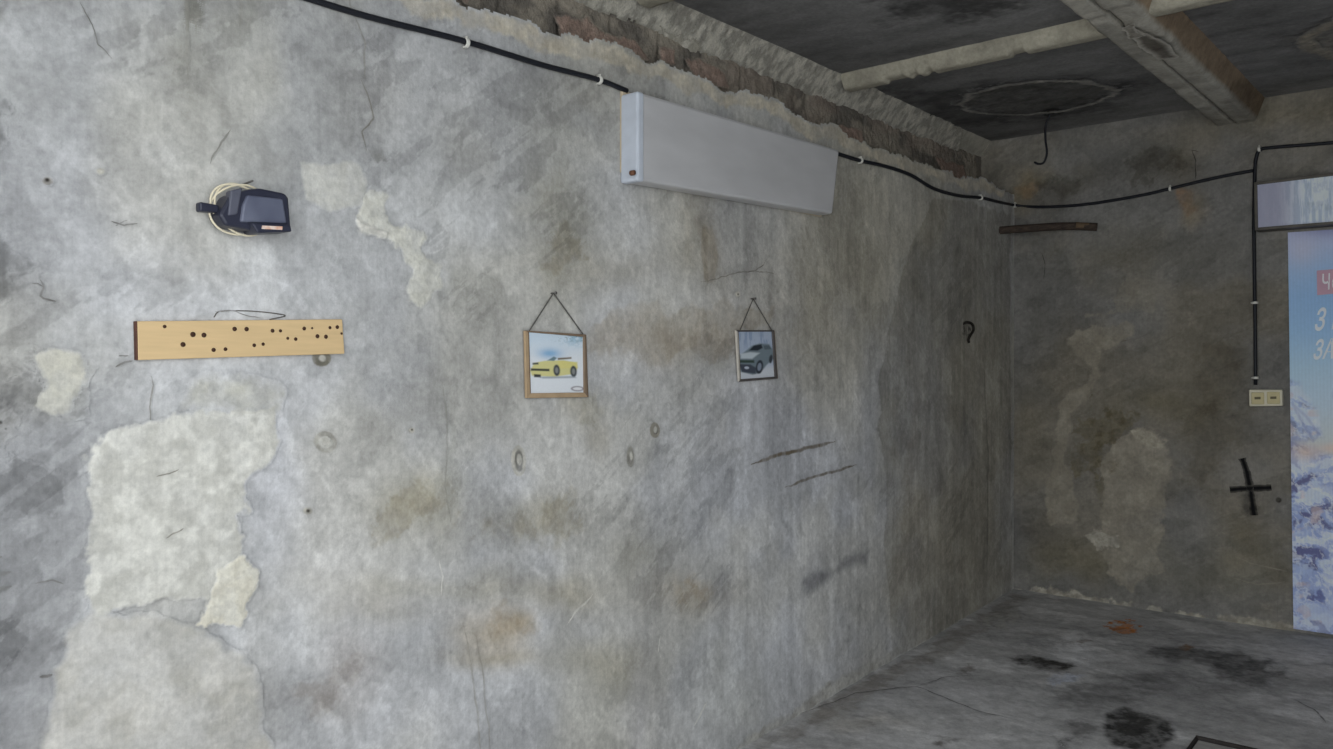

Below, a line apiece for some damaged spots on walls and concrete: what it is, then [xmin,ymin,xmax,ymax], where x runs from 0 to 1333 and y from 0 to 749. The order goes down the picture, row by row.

flaking render [389,0,1005,199]
leakage [731,196,1297,749]
peeling [195,554,260,630]